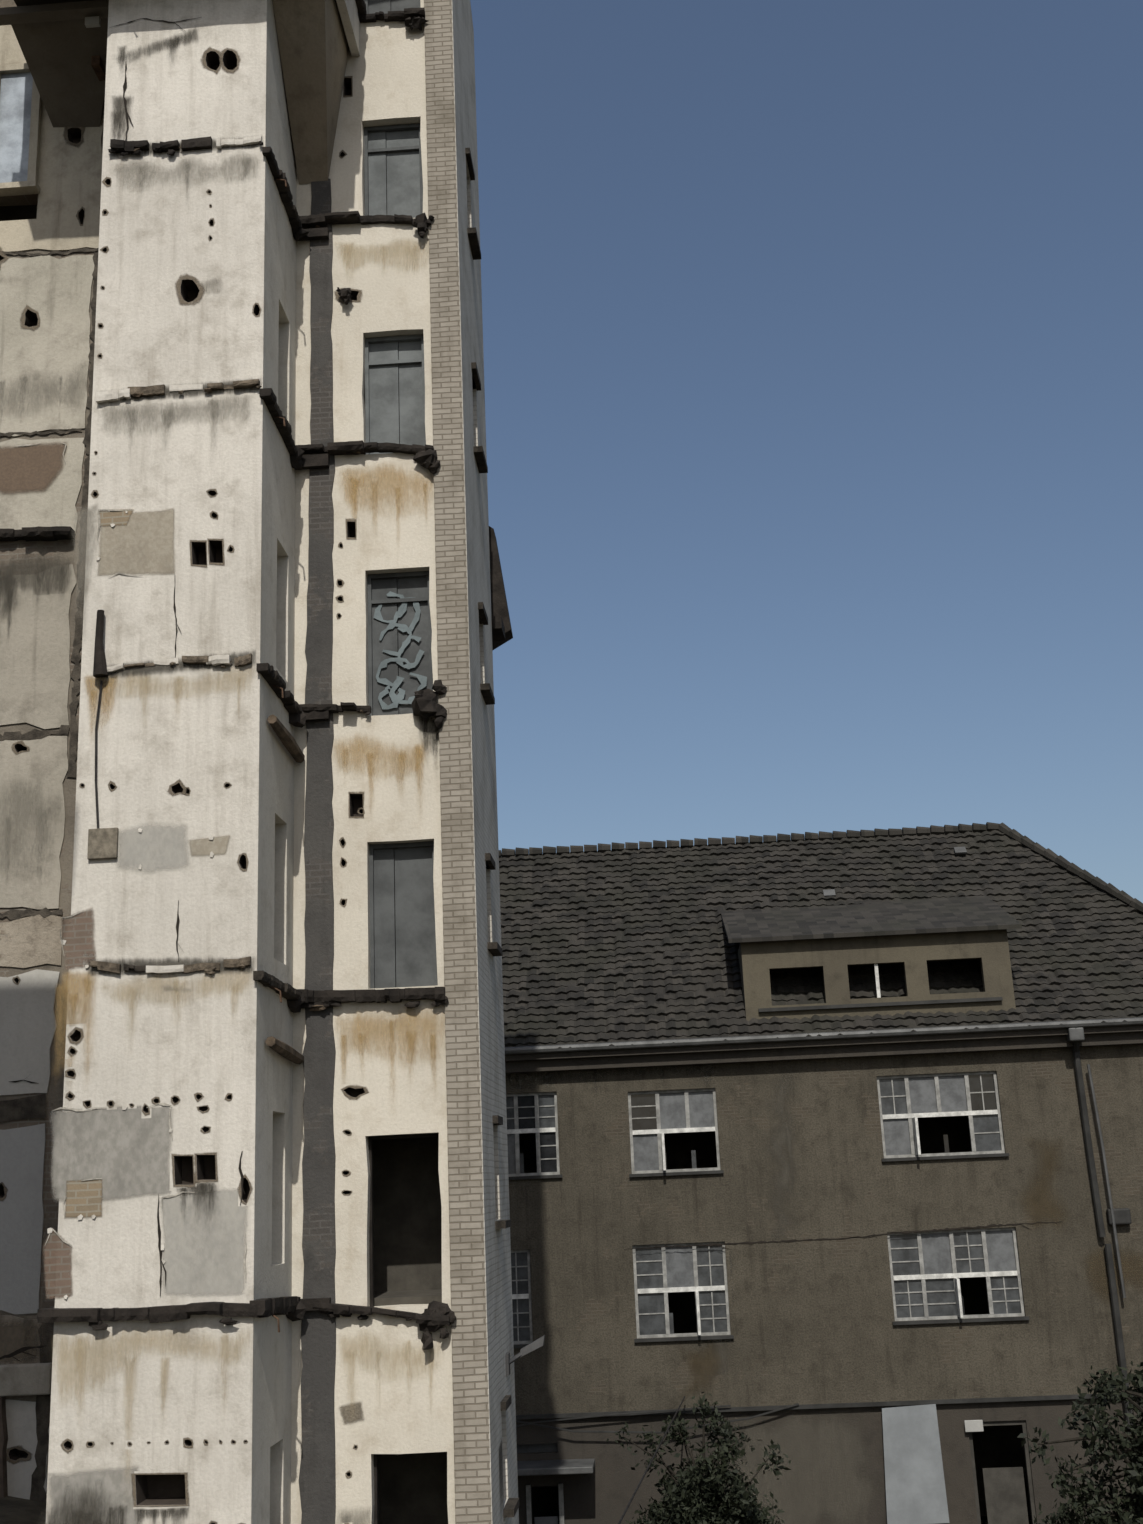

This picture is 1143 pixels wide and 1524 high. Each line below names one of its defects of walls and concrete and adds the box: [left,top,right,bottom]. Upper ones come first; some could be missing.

damp [0,556,69,623]